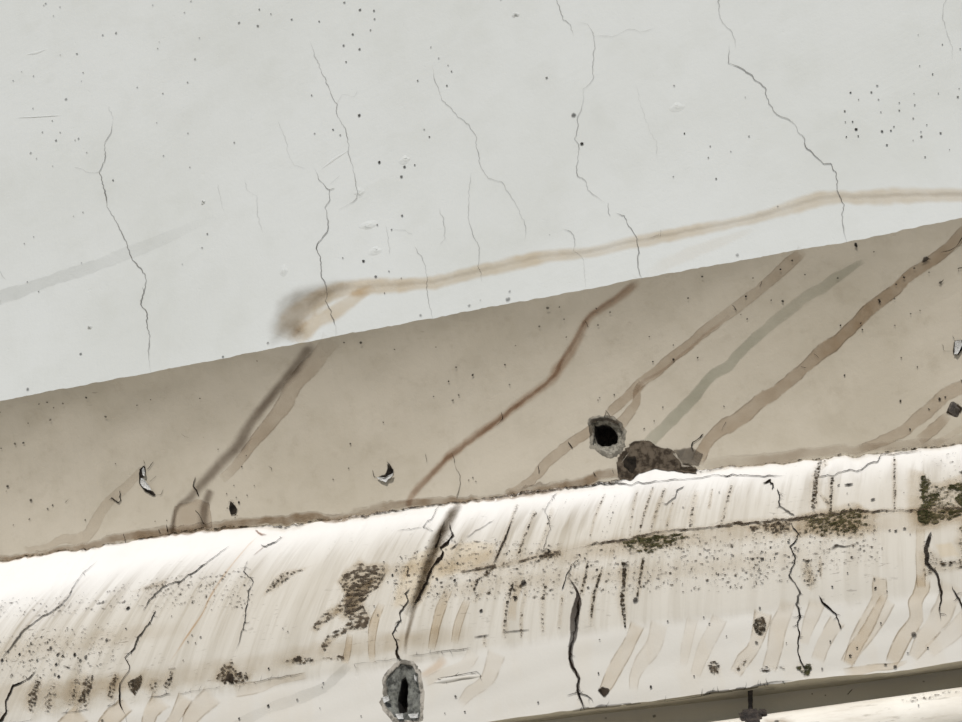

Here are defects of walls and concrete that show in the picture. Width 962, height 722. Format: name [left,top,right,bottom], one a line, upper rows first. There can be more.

crack [99,136,150,342]
crack [0,676,31,722]
crack [2,548,91,657]
mould [0,570,253,712]
damp [147,519,325,538]
hole [398,678,408,714]
crack [392,507,466,660]
hole [595,424,618,446]
damp [313,440,962,660]
crack [562,559,785,711]
crack [579,470,841,669]
crack [817,451,914,477]